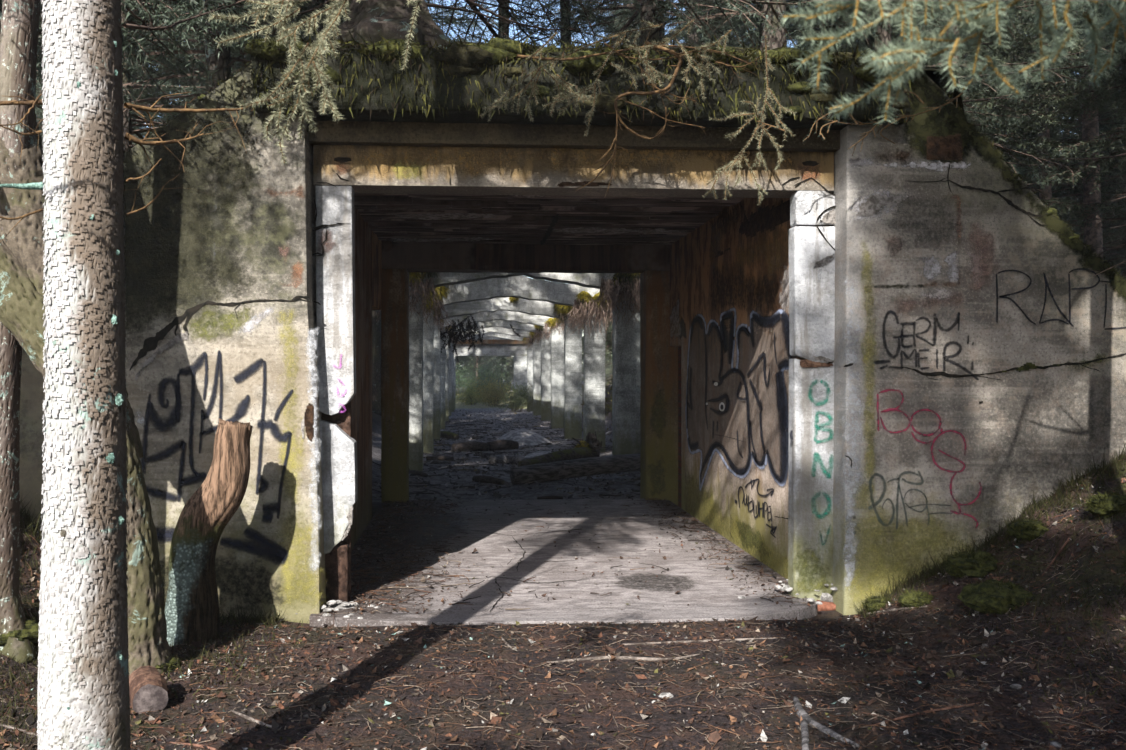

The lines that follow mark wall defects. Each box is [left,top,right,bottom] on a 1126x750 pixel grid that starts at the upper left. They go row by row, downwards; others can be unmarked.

crack [912,162,1060,226]
crack [130,296,321,370]
crack [903,353,1126,381]
damp [308,330,318,522]
damp [844,281,861,578]